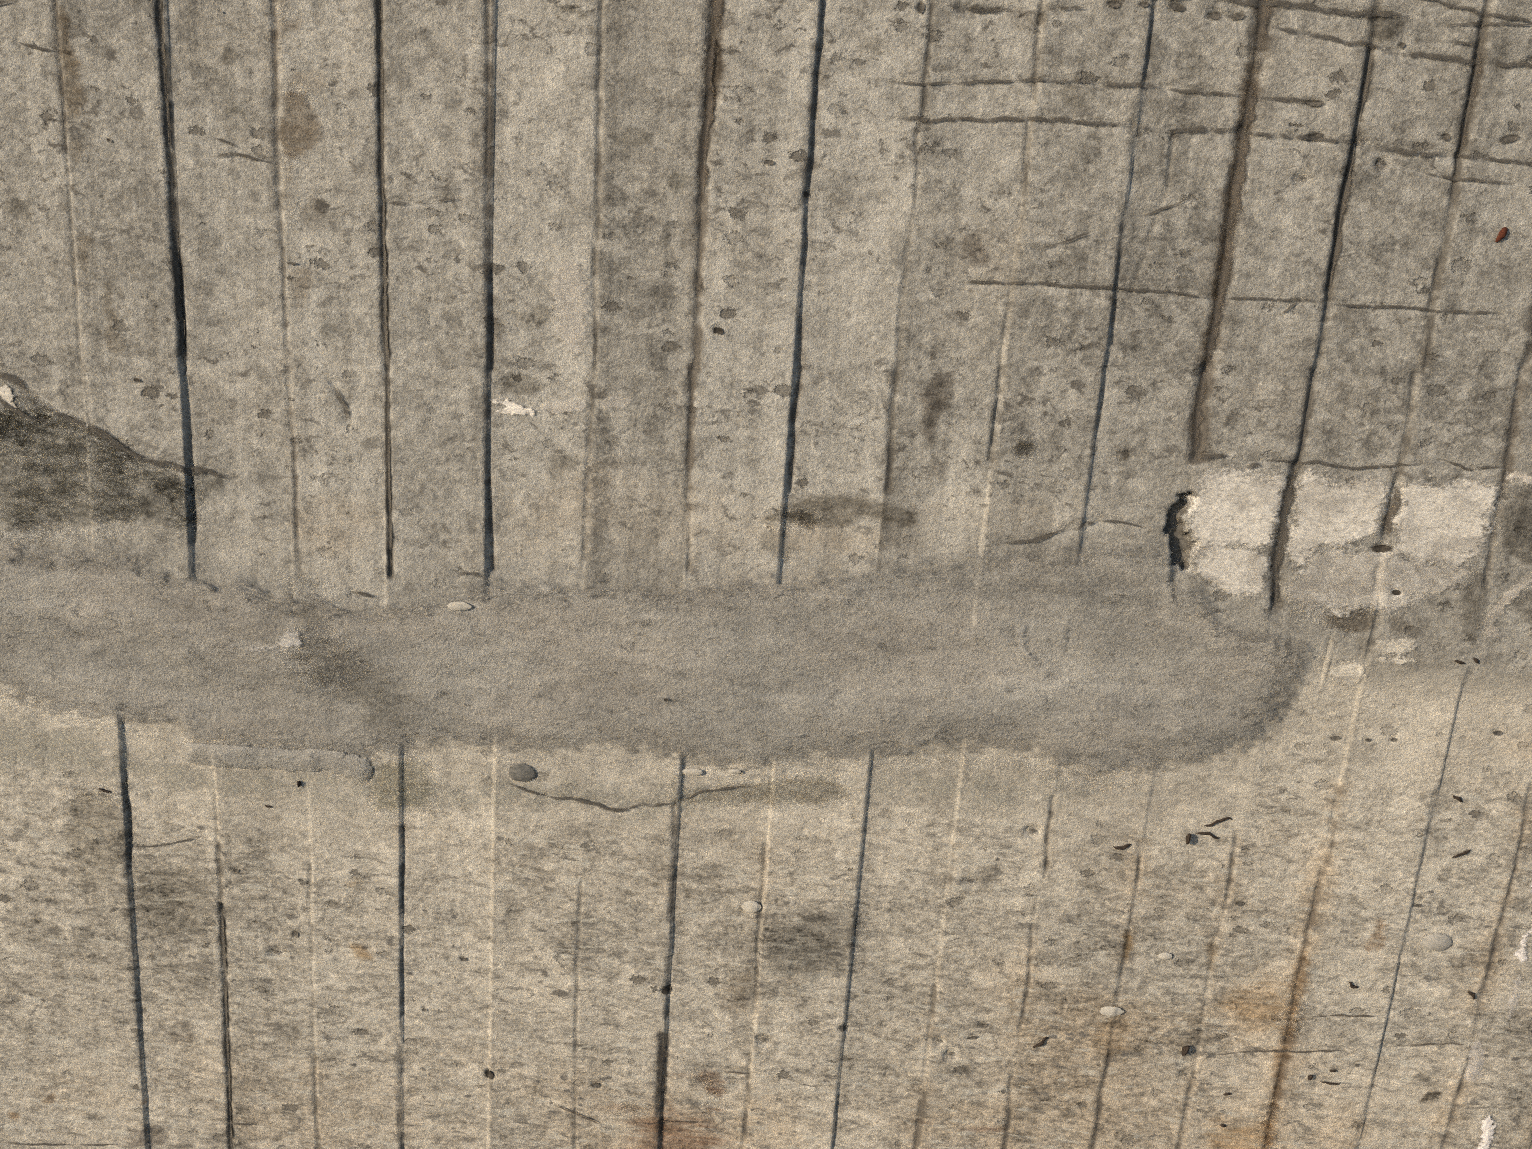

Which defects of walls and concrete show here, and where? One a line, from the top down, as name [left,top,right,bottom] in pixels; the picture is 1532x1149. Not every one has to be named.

damp [0,372,25,392]
damp [0,398,35,421]
damp [55,412,224,478]
peeling [1188,467,1532,617]
peeling [1484,573,1532,638]
efflorescence [1514,928,1532,962]
efflorescence [1476,1116,1496,1149]